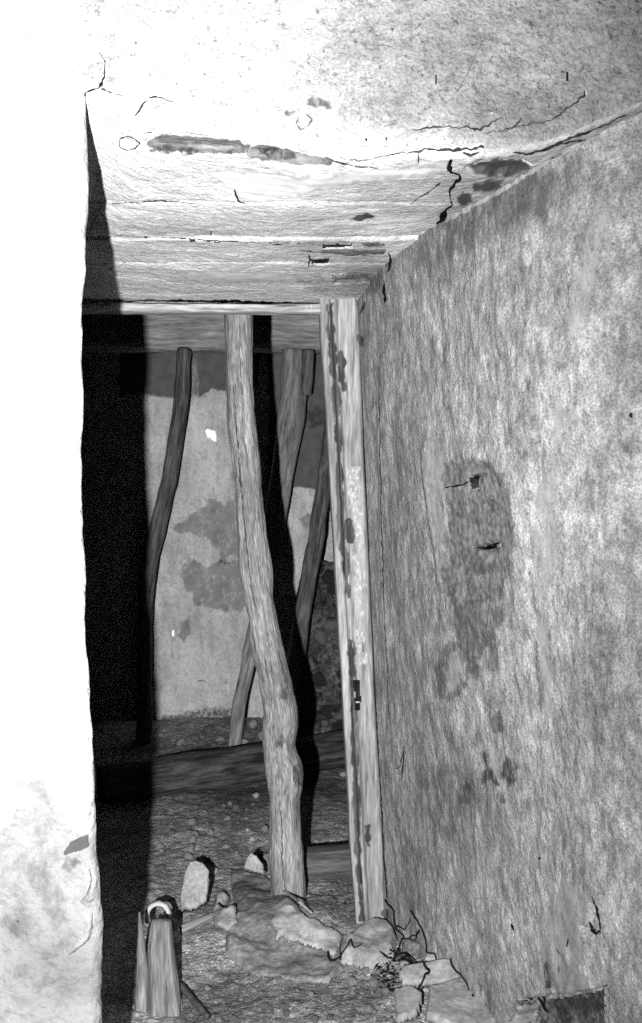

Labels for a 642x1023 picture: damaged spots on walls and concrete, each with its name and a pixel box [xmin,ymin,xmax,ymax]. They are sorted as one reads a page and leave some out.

crack [84,54,173,118]
crack [325,90,627,225]
water stain [174,495,245,611]
water stain [434,598,505,699]
crack [556,896,601,976]